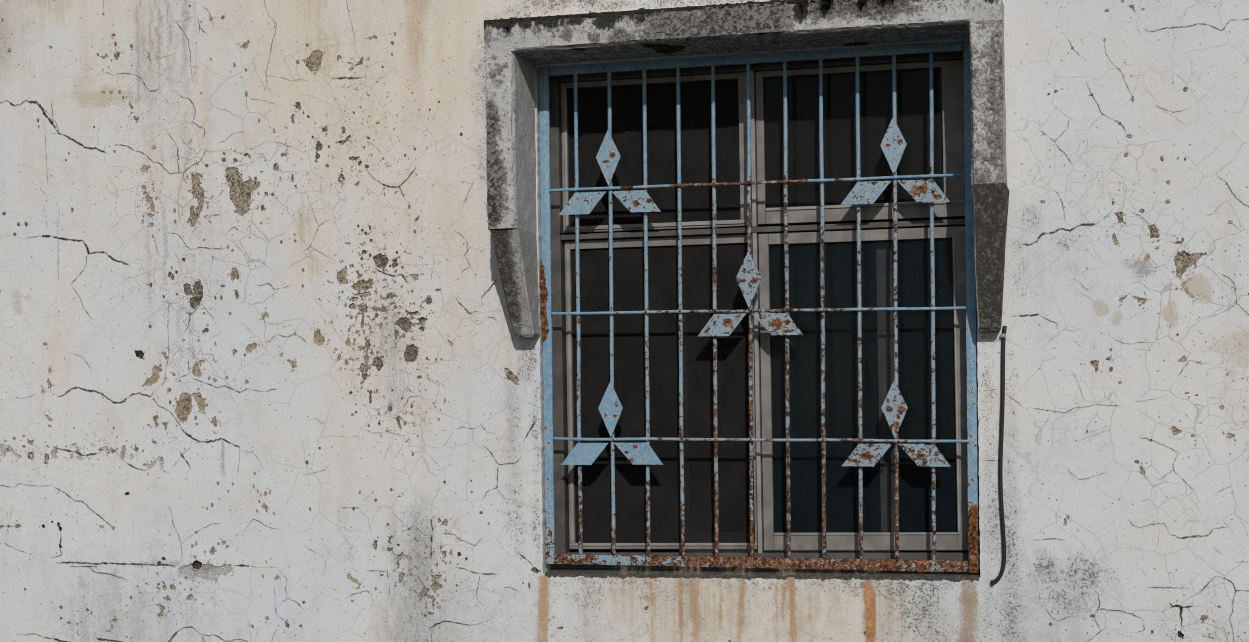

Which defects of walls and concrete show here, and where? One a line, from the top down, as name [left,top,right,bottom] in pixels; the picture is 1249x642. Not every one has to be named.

water stain [509,0,622,41]
water stain [588,0,919,43]
crack [0,72,206,174]
water stain [473,18,512,225]
flaking render [222,152,274,224]
crack [27,235,128,316]
flaking render [149,258,239,314]
flaking render [336,225,443,429]
corrosion [539,260,550,342]
crack [59,303,275,472]
corrosion [538,575,548,642]
corrosion [864,580,876,642]